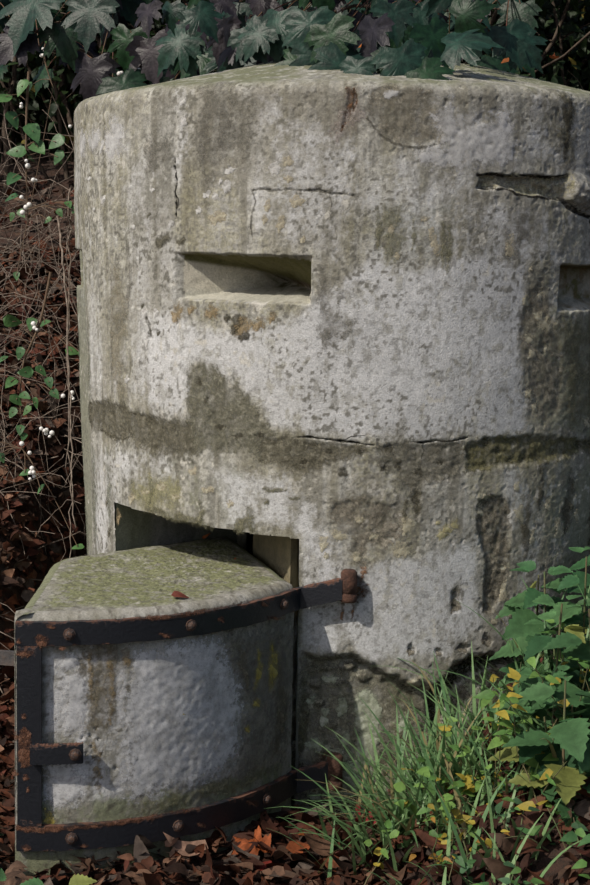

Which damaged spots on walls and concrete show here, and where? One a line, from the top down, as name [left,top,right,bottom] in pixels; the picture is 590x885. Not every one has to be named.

crack [172,158,180,217]
crack [250,188,358,235]
crack [477,173,590,223]
crack [298,435,374,446]
crack [412,437,466,459]
rust [340,568,368,620]